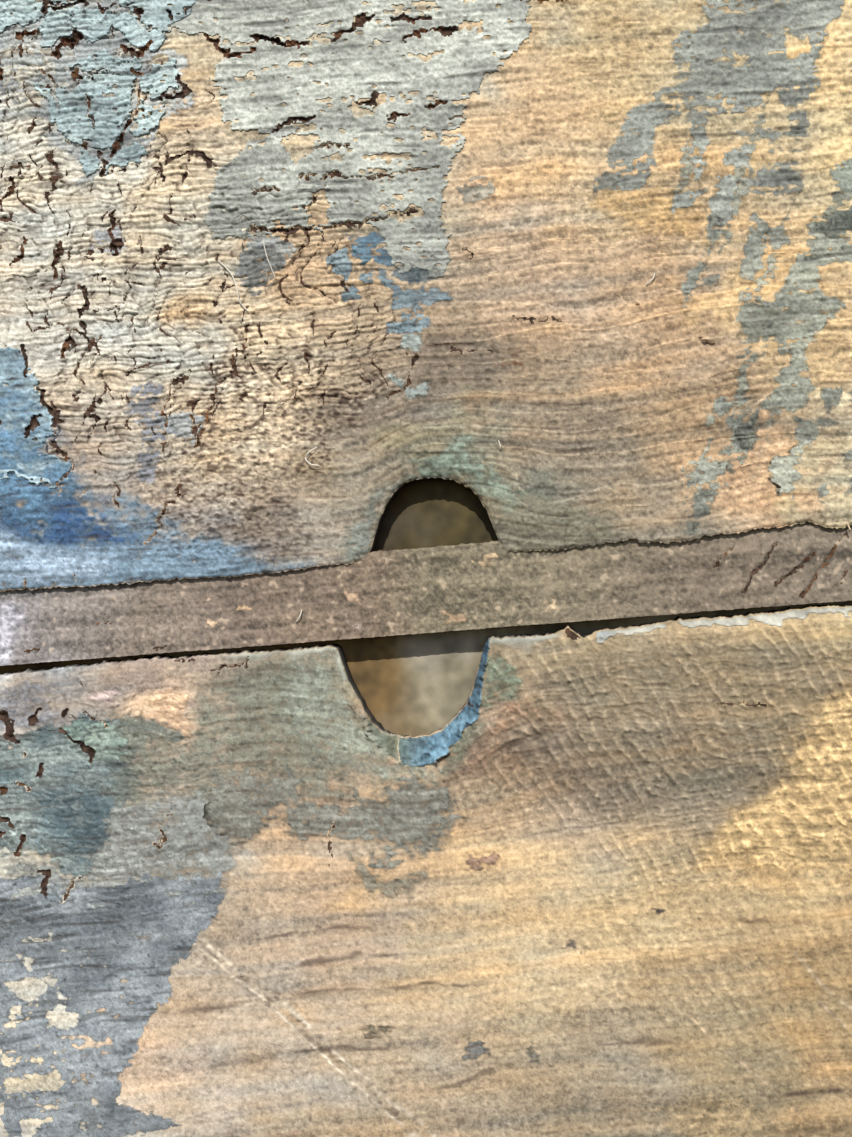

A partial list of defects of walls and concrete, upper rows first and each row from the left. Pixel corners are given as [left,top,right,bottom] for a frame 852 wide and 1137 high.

peeling [0,347,157,664]
peeling [124,381,205,484]
crack [144,479,186,544]
crack [0,0,463,507]
peeling [0,0,532,352]
peeling [344,591,360,605]
peeling [388,373,430,399]
crack [450,345,493,354]
crack [512,315,562,324]
peeling [593,0,852,535]
crack [0,681,107,904]
peeling [0,713,225,1137]